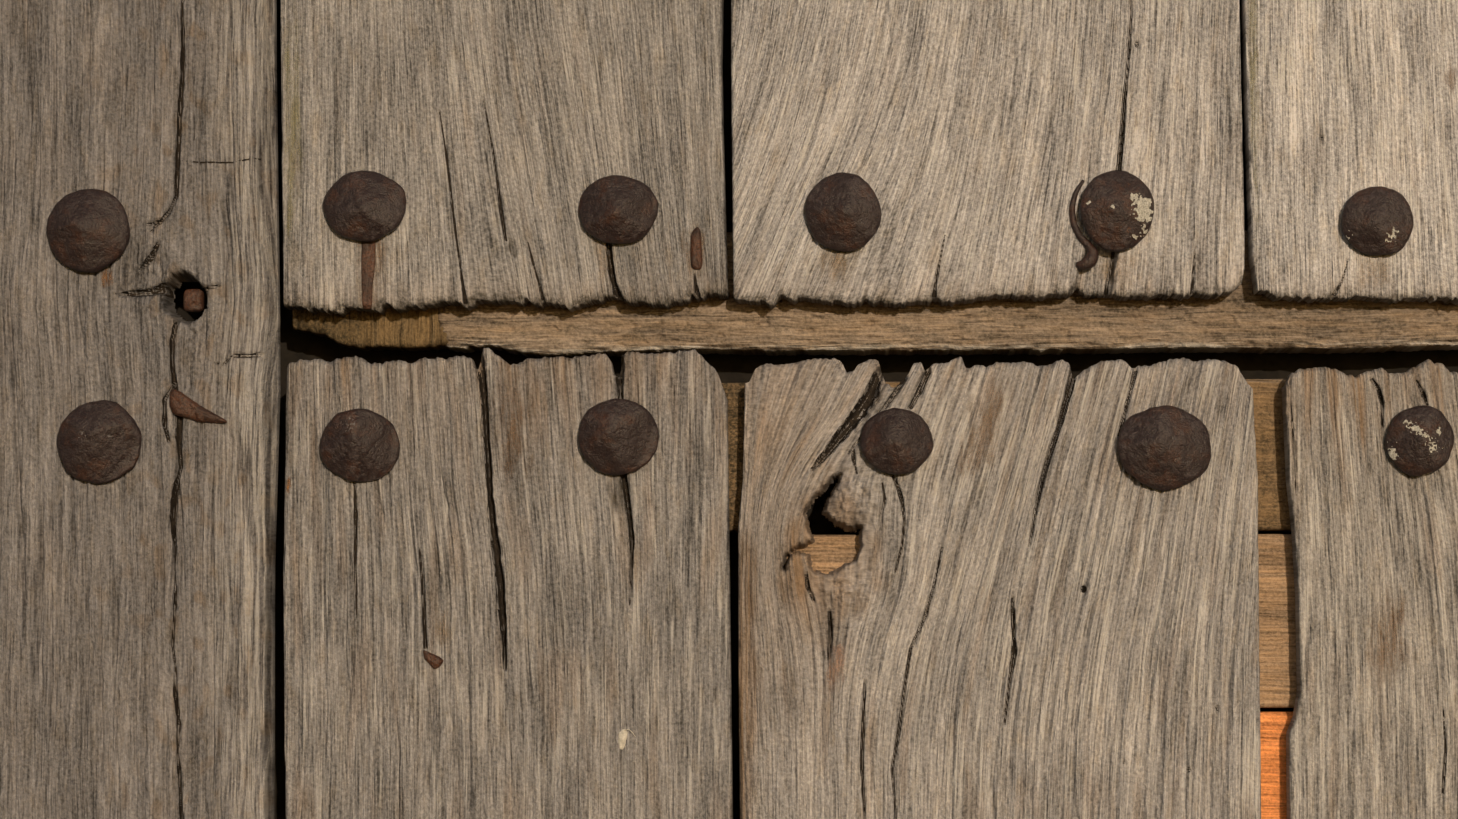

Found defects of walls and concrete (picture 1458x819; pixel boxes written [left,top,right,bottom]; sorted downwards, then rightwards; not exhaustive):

crack [1116,8,1133,171]
crack [115,0,261,819]
crack [476,351,507,669]
crack [811,371,931,572]
crack [1104,252,1115,295]
crack [804,547,943,819]